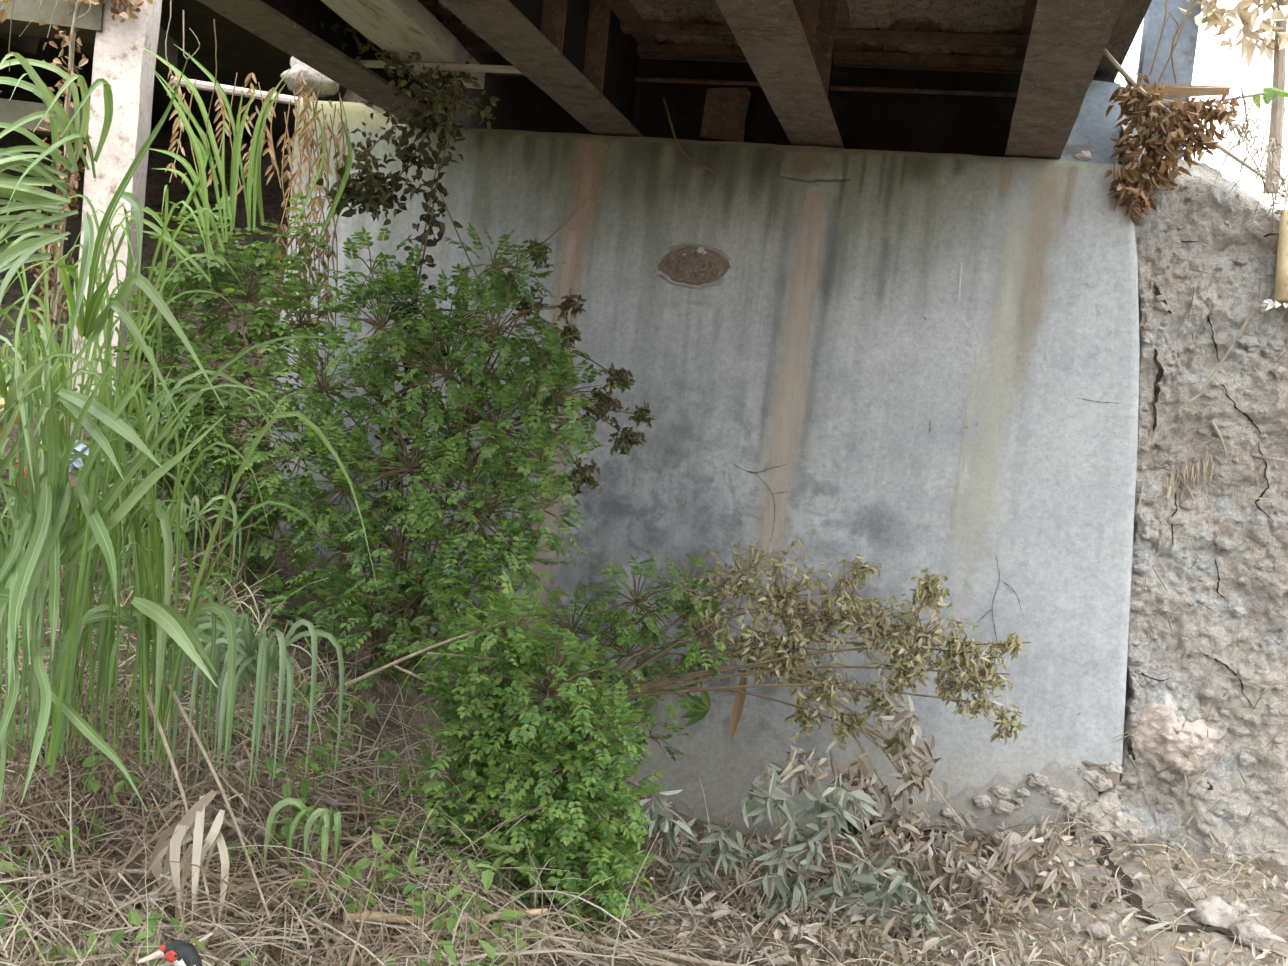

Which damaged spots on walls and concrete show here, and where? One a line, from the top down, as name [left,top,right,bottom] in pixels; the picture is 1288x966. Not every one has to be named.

rust [555,142,608,350]
spalling [656,243,732,289]
rust [543,372,563,459]
crack [977,553,1023,664]